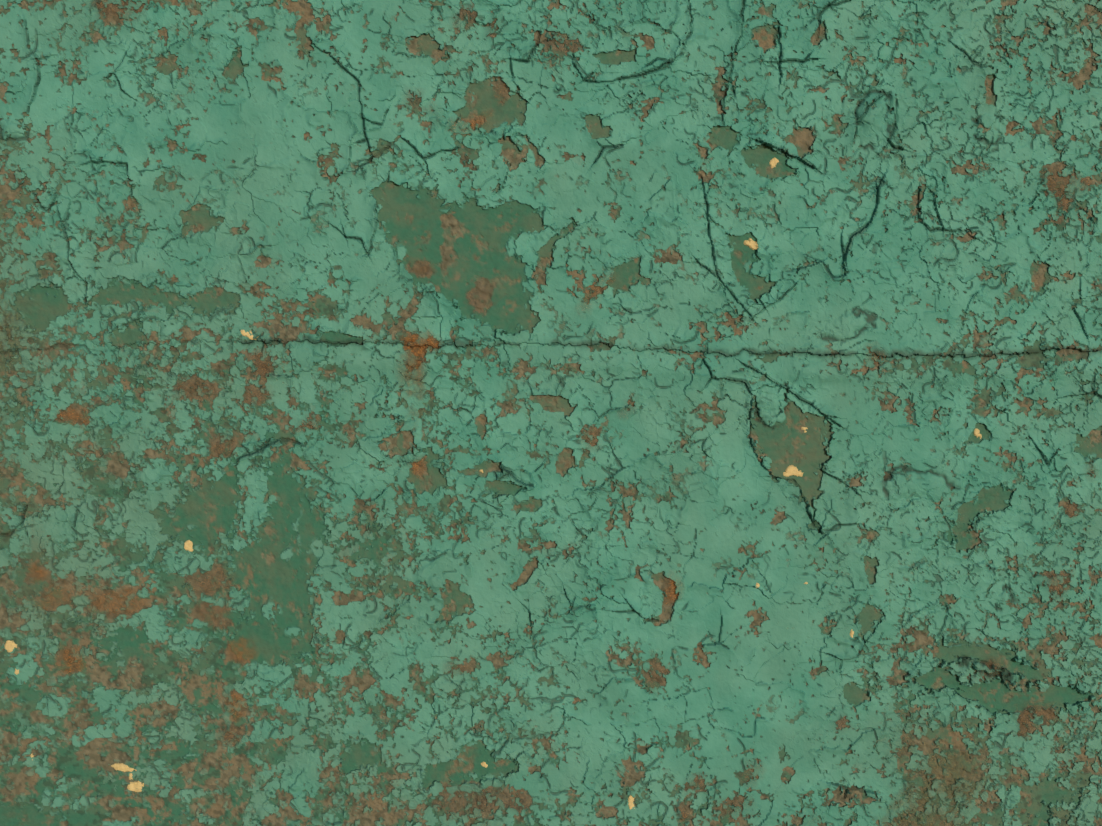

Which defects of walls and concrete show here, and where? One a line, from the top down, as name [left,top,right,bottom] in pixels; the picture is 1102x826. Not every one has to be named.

crack [312,42,459,173]
crack [509,0,694,85]
crack [766,0,851,84]
peeling [370,22,588,346]
crack [695,95,904,321]
crack [916,187,979,240]
crack [0,309,1102,538]
peeling [739,379,841,540]
peeling [222,446,338,683]
peeling [639,562,689,635]
peeling [904,635,1096,728]
peeling [111,763,144,792]